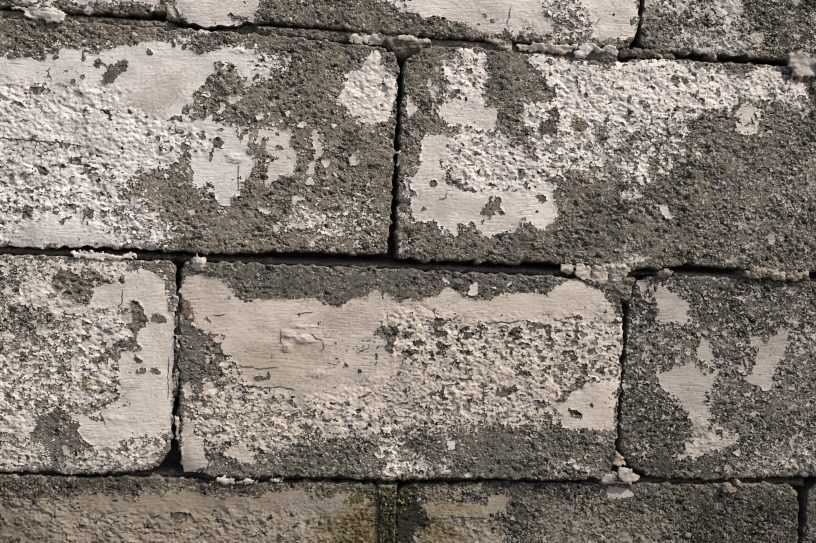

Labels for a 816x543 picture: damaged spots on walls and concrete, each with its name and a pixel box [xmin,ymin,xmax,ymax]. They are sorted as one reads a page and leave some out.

peeling [0,0,399,271]
peeling [0,250,816,543]